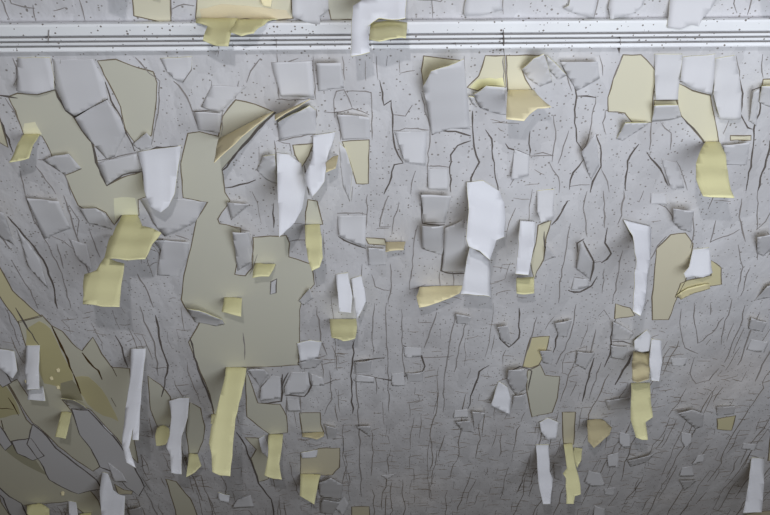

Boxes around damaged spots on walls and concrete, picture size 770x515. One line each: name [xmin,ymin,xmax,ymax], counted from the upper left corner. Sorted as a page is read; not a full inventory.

crack [0,0,223,186]
peeling [132,0,172,21]
peeling [607,54,770,198]
crack [2,159,214,410]
peeling [0,56,370,515]
crack [125,30,770,515]
peeling [515,189,555,295]
peeling [614,159,722,320]
peeling [491,330,687,504]
peeling [742,439,770,515]